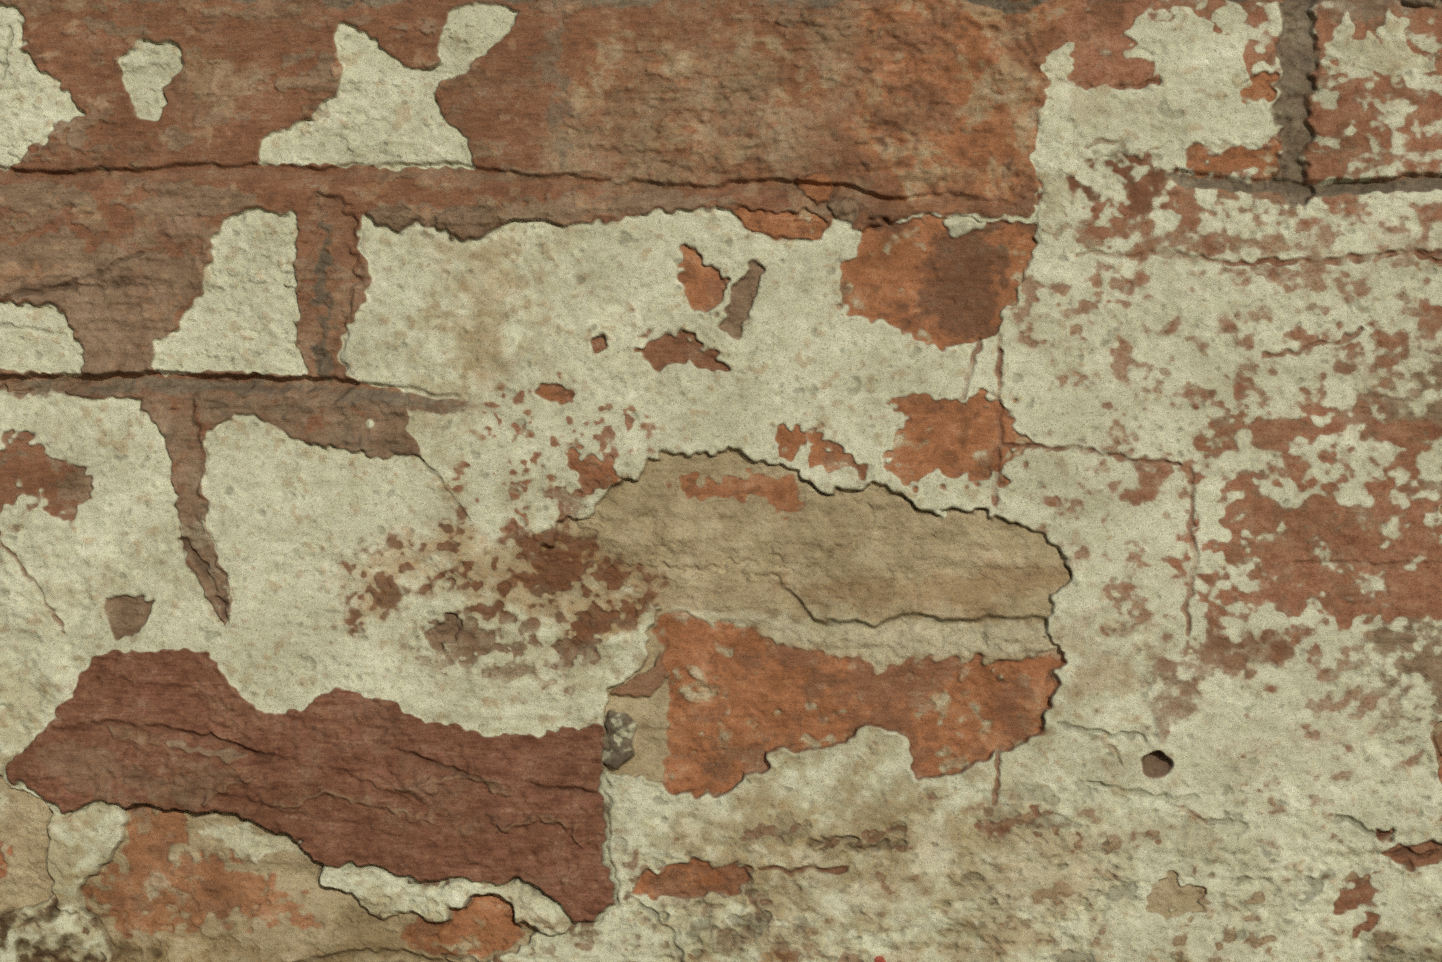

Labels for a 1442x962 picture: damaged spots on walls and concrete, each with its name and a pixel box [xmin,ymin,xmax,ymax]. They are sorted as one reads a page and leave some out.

peeling [0,4,86,171]
peeling [118,39,183,121]
peeling [260,3,518,172]
spalling [1240,70,1280,103]
spalling [1186,138,1283,180]
spalling [735,207,828,240]
spalling [837,214,1038,351]
spalling [0,430,93,522]
spalling [540,389,1071,796]
peeling [108,725,249,765]
crack [1054,719,1251,837]
spalling [1431,721,1442,782]